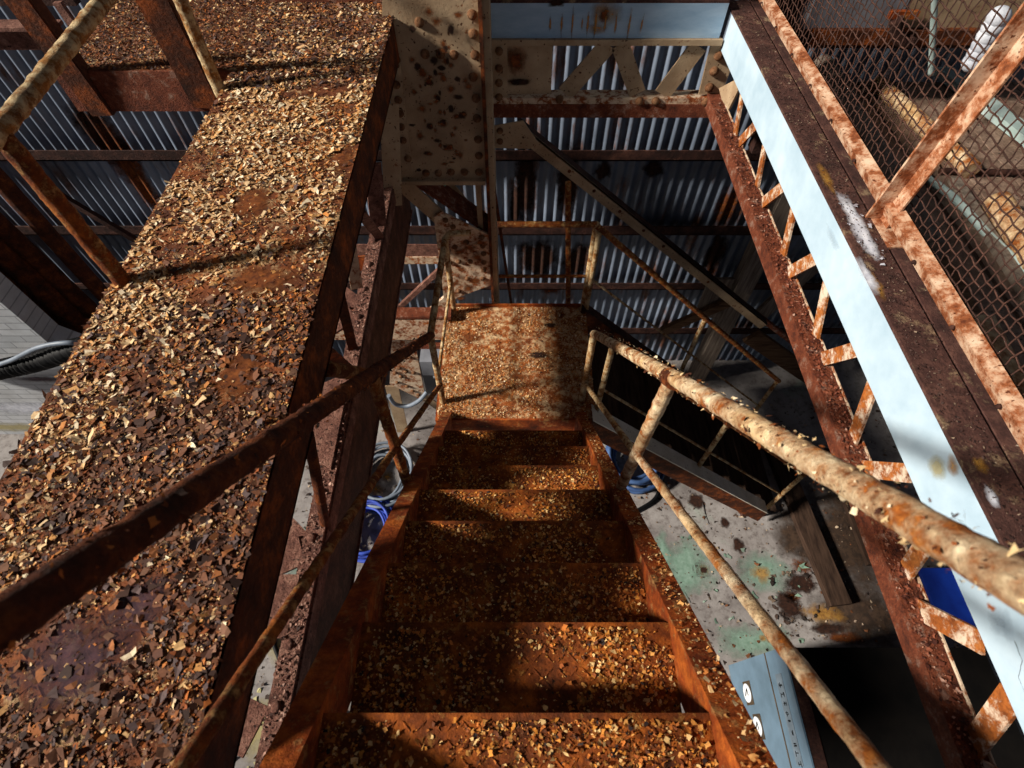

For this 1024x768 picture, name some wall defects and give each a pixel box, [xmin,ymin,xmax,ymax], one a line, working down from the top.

rust [549,5,643,38]
rust [409,7,471,172]
rust [68,1,388,369]
rust [519,240,589,275]
rust [703,189,739,275]
rust [70,231,217,430]
rust [0,454,169,574]
rust [209,386,291,464]
rust [437,267,775,768]
rust [932,460,956,474]
rust [67,584,107,617]
rust [68,603,217,768]